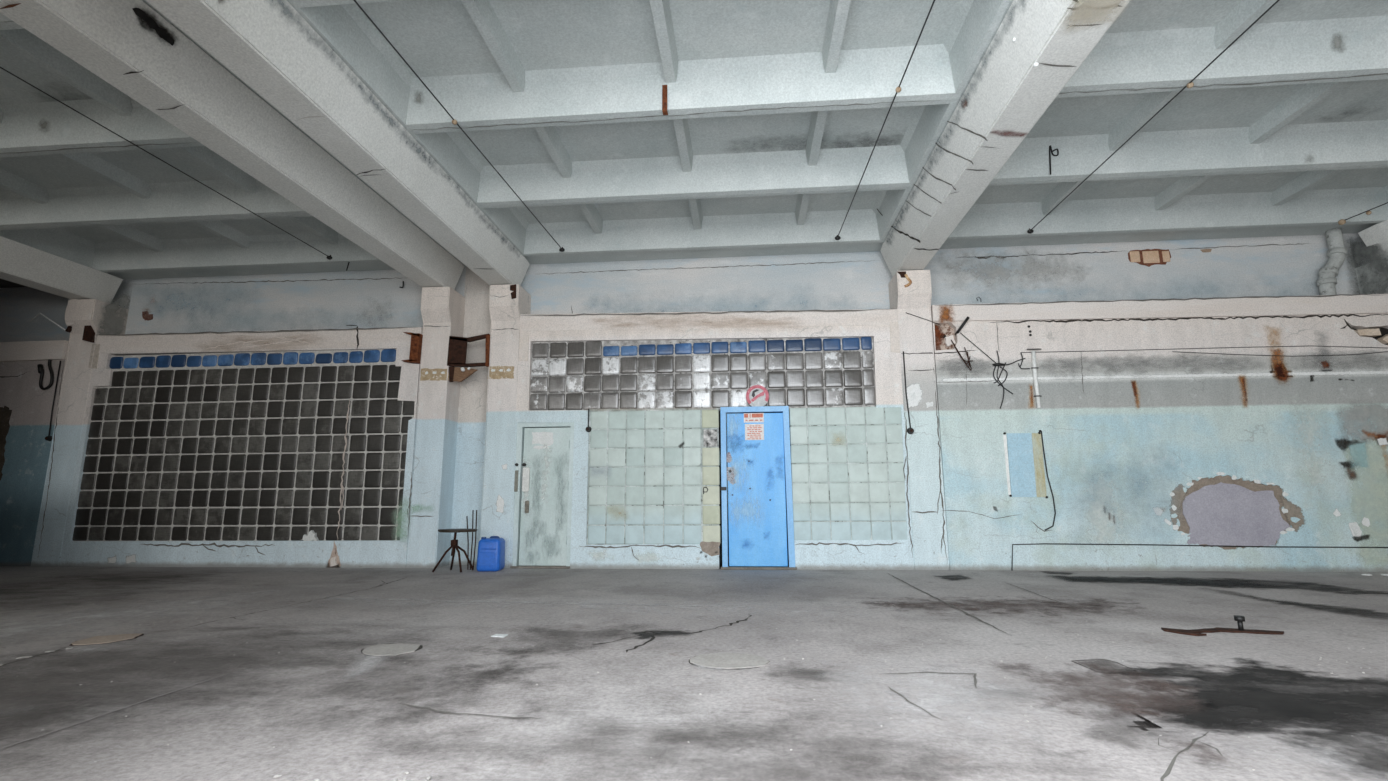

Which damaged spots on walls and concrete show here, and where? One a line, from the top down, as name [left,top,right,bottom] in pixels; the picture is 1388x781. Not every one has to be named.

flaking render [1128,249,1171,267]
leakage [1347,242,1388,294]
rust [1271,330,1288,381]
spalling [1352,328,1388,345]
spalling [1153,471,1305,550]